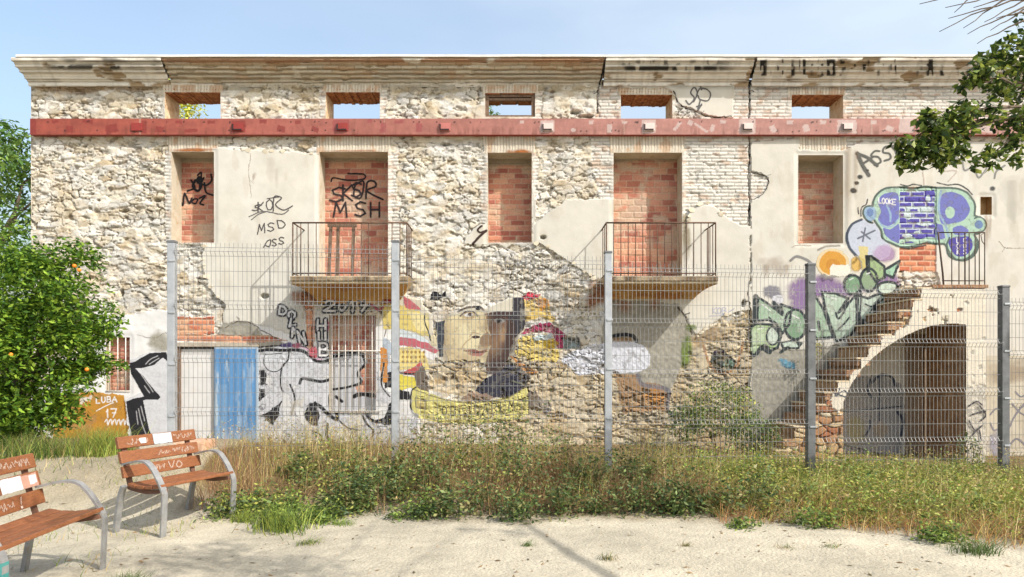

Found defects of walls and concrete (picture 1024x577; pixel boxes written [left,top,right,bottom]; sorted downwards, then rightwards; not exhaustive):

crack [673,84,771,225]
peeling [31,135,930,450]
peeling [897,270,941,289]